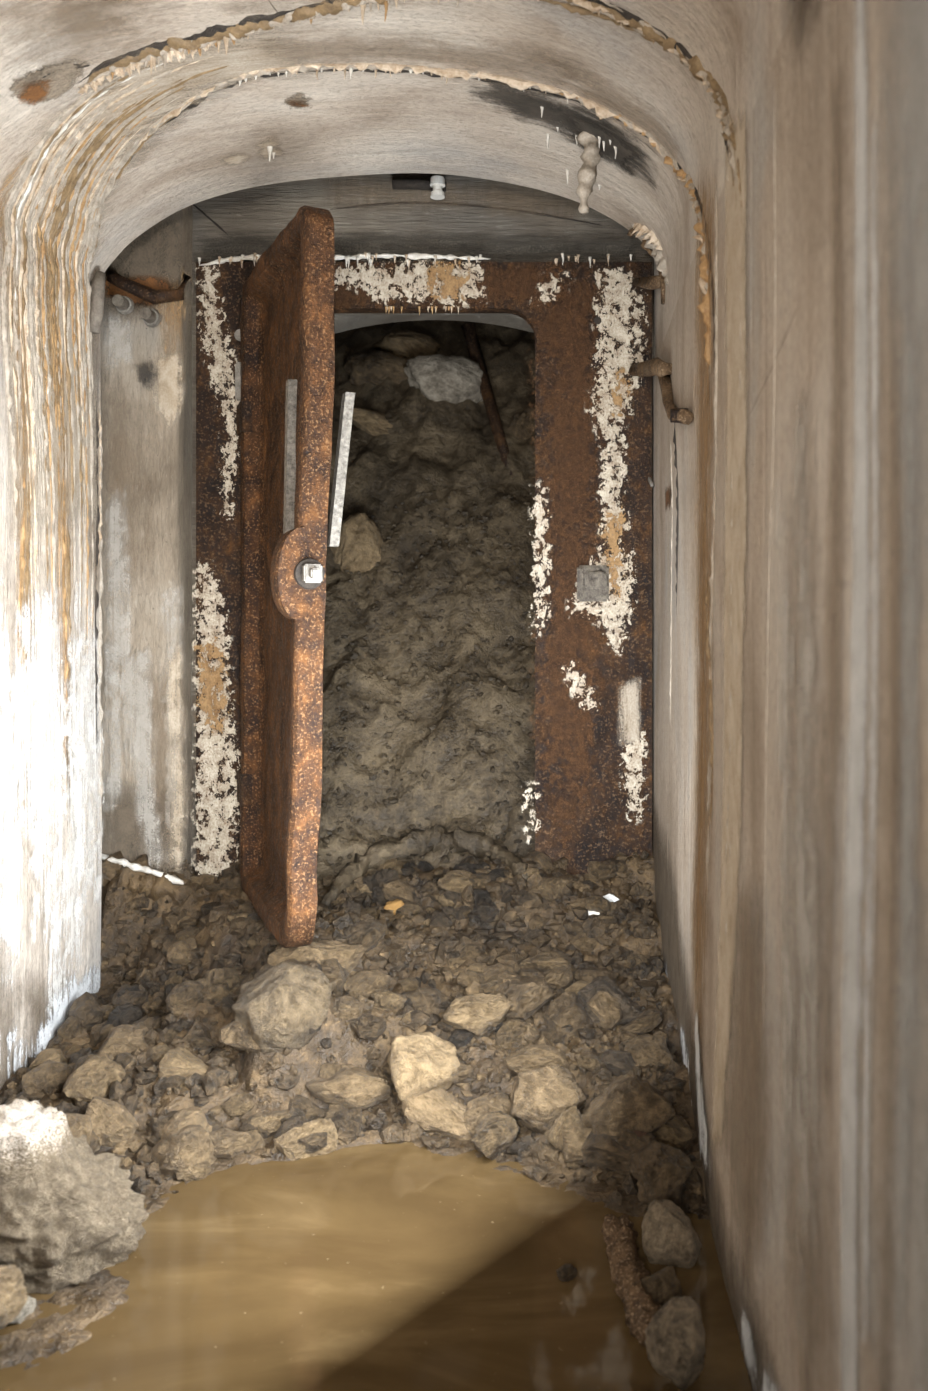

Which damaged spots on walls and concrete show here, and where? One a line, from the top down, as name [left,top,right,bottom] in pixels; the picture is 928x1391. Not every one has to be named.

water stain [382,47,663,188]
corrosion [104,214,186,351]
water stain [334,233,636,269]
water stain [0,30,364,1090]